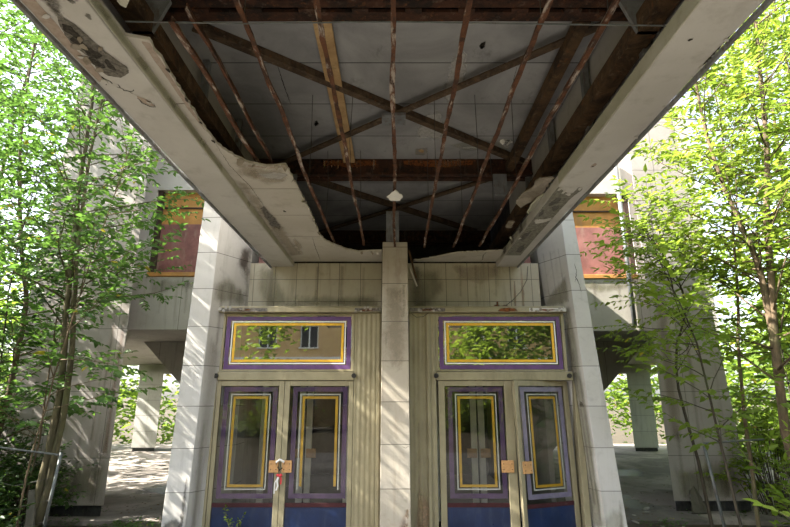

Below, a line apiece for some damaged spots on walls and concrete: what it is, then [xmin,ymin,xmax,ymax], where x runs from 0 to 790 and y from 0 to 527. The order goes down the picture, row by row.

water stain [44,0,60,16]
peeling [21,0,129,84]
spalling [142,41,205,130]
peeling [506,176,583,255]
water stain [136,484,166,494]
water stain [165,480,187,527]